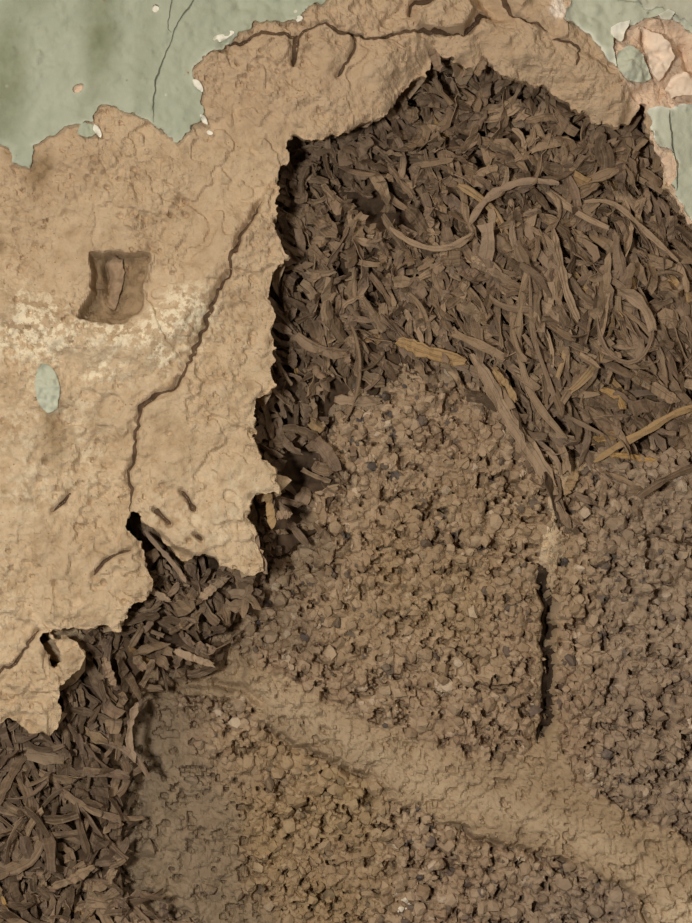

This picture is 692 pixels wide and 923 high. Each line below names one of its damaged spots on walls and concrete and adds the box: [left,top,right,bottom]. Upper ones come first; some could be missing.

crack [127,202,262,511]
peeling [0,0,692,736]